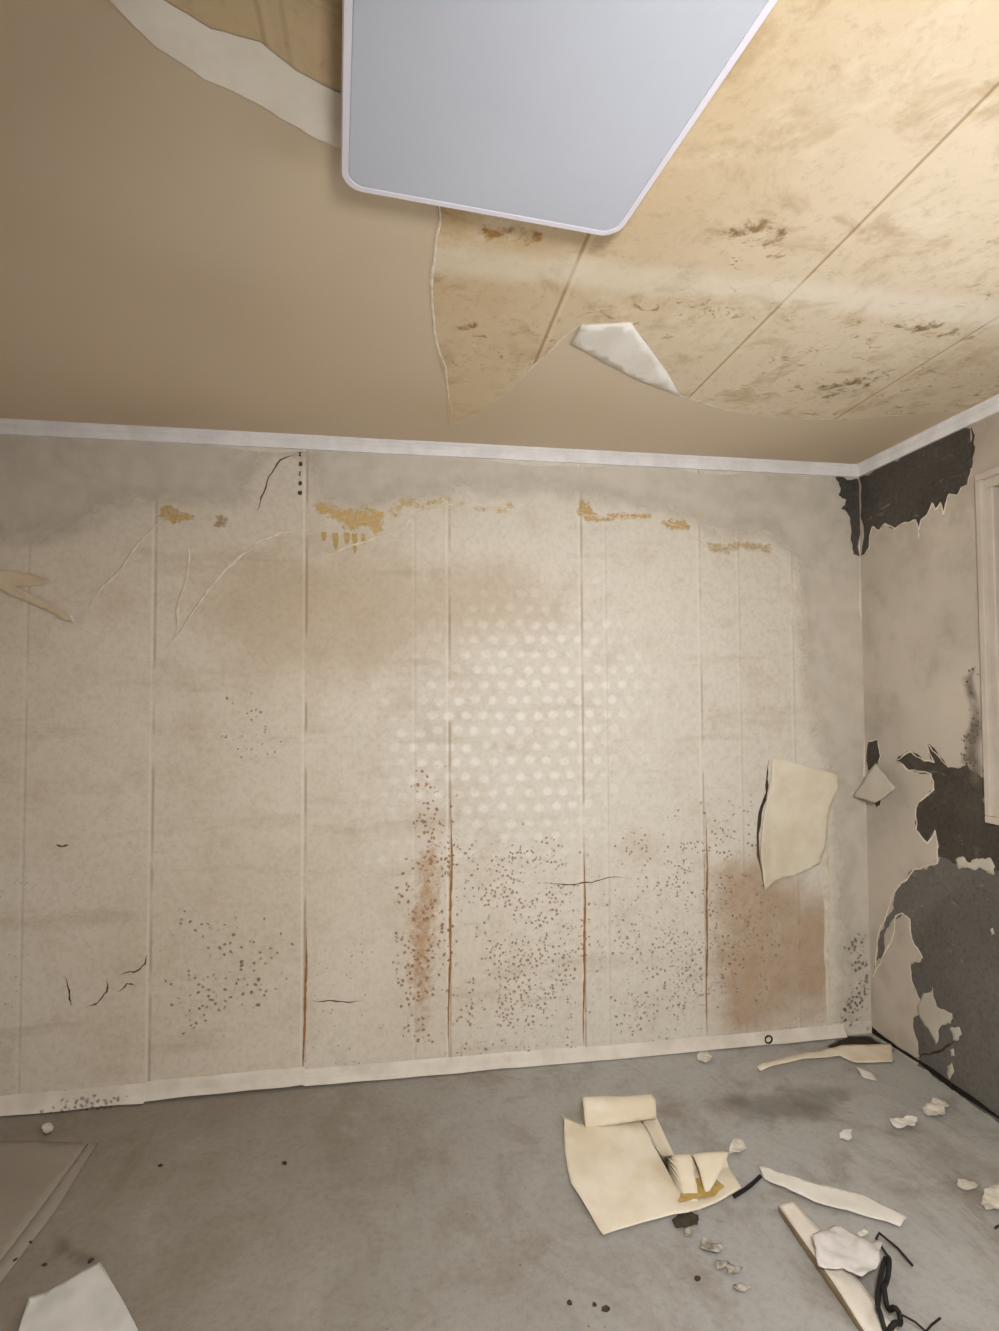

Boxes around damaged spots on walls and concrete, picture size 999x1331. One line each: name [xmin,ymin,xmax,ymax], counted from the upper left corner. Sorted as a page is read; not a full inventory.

peeling [110,0,342,148]
peeling [429,0,999,426]
leakage [730,221,785,245]
peeling [0,435,260,548]
crack [258,452,302,509]
leakage [317,504,383,553]
leakage [578,502,650,521]
peeling [302,428,999,1123]
rust [393,770,458,1046]